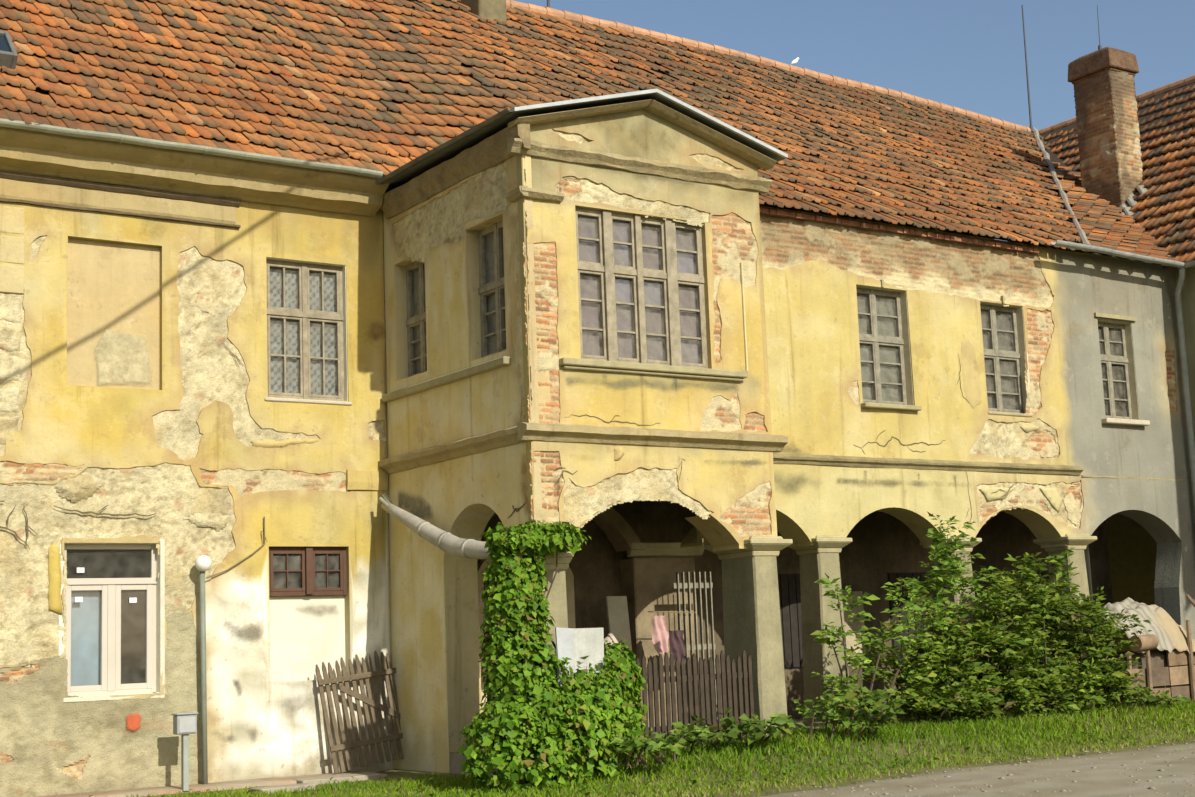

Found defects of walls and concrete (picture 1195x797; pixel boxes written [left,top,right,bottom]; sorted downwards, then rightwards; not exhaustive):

peeling [393,162,507,262]
peeling [29,235,47,260]
flaking render [513,212,560,424]
flaking render [555,176,1059,460]
flaking render [1165,346,1177,412]
peeling [0,246,351,684]
crack [569,414,658,426]
peeling [529,451,771,537]
crack [854,430,946,453]
peeling [977,482,1083,529]
flaking render [56,754,91,779]